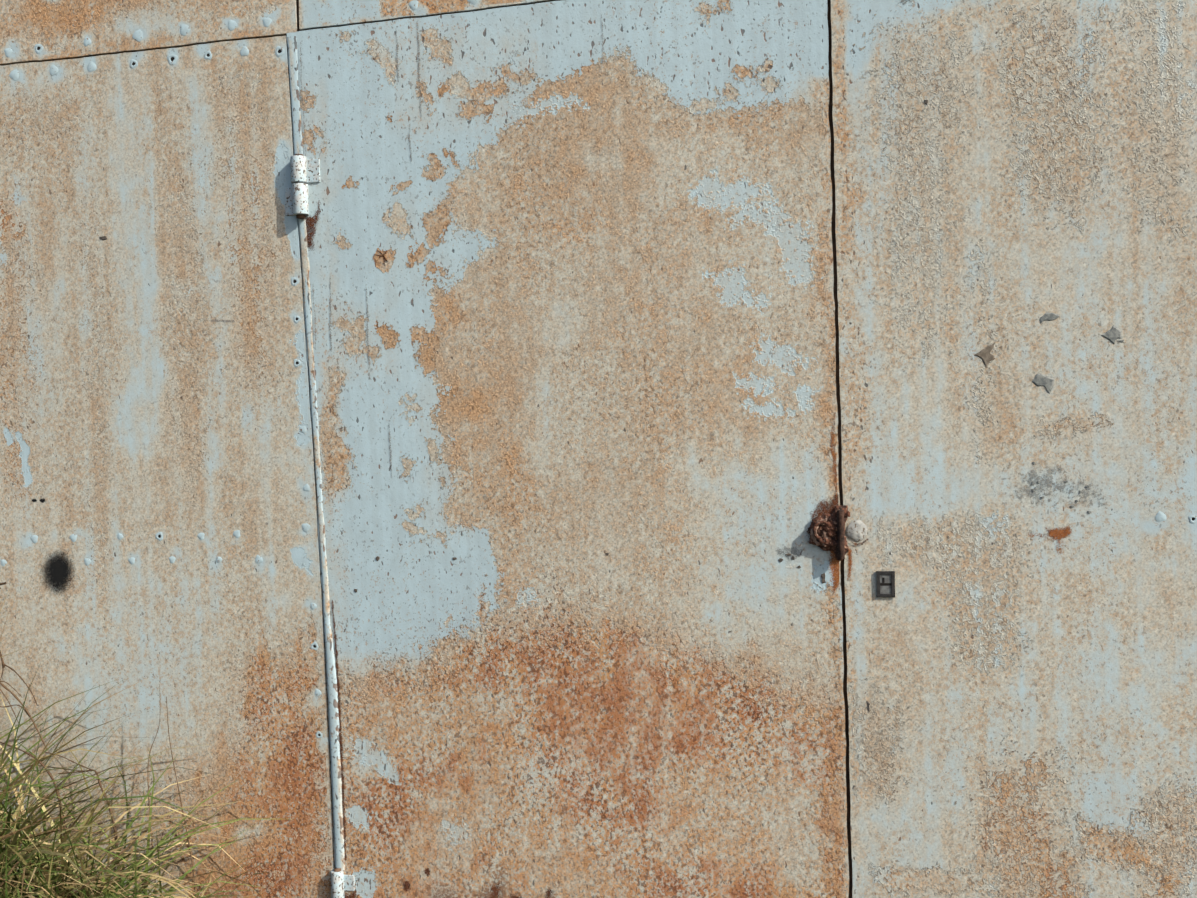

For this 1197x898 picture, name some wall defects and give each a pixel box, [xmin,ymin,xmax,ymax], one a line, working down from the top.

rust [378,0,538,124]
rust [0,81,92,525]
rust [147,59,290,521]
rust [305,198,321,251]
peeling [339,43,841,719]
rust [850,0,1197,467]
rust [825,505,1072,681]
peeling [342,803,377,832]
peeling [352,867,378,898]
peeling [350,735,401,785]
peeling [440,813,473,855]
rust [869,733,1197,898]